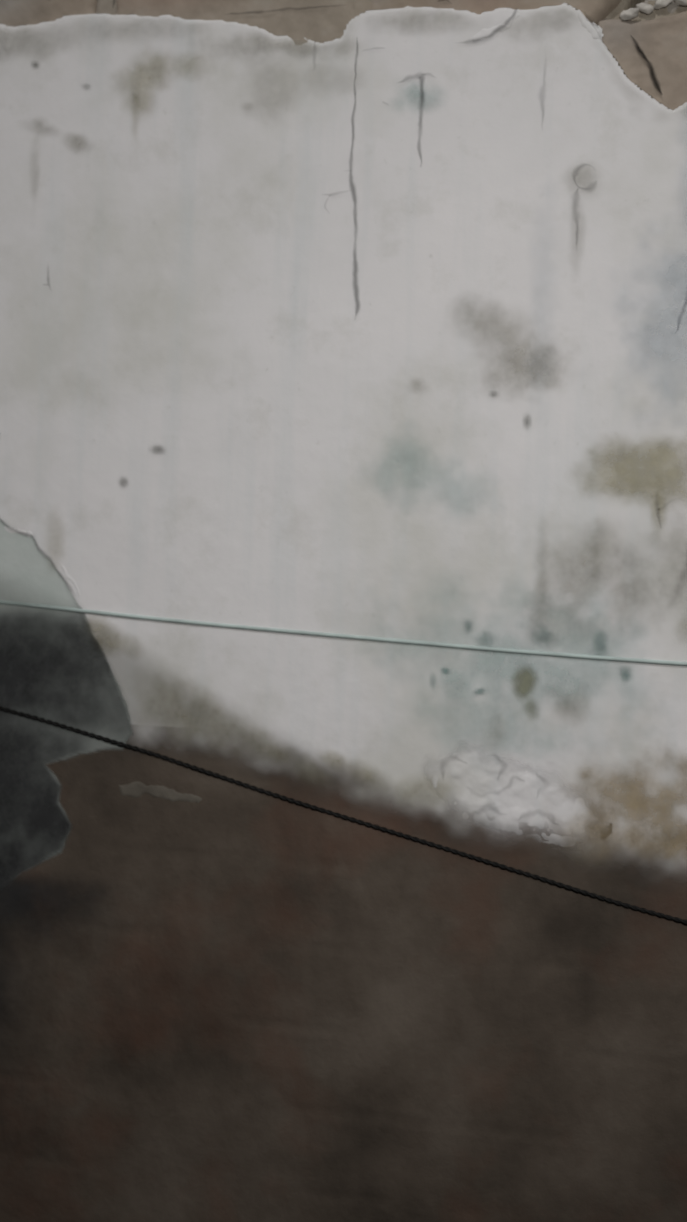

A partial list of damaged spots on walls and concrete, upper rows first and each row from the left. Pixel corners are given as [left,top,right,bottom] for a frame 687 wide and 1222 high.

spalling [0,0,687,110]
peeling [0,520,687,1222]